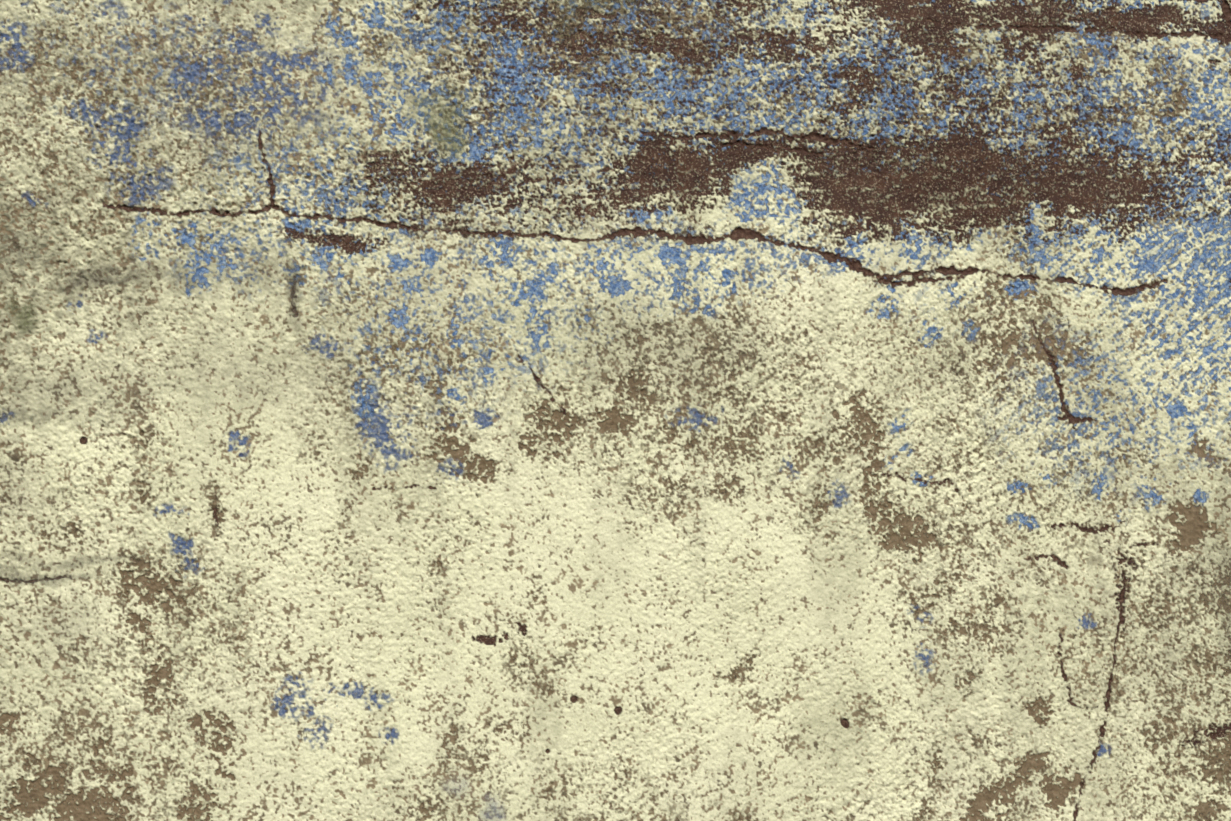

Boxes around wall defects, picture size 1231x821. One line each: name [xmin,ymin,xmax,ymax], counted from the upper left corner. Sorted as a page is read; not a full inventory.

crack [926,0,1231,39]
crack [102,127,1167,296]
crack [290,276,298,317]
crack [1032,319,1098,429]
crack [1024,521,1159,821]